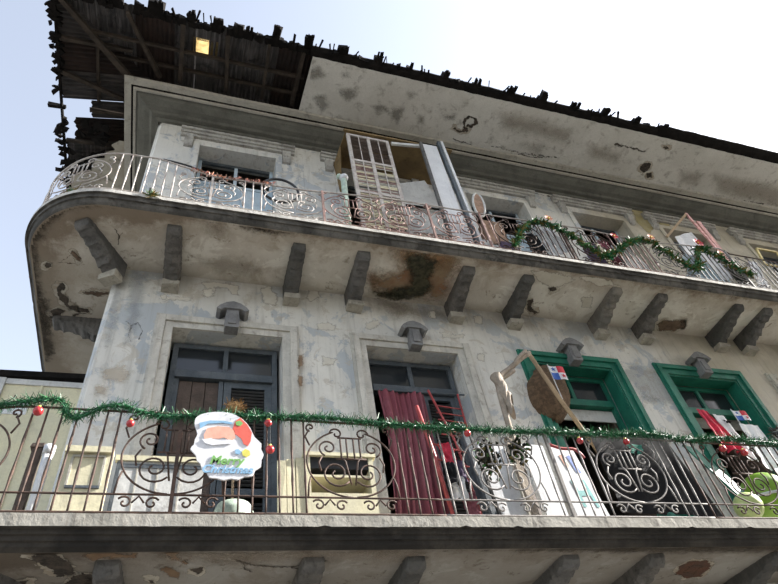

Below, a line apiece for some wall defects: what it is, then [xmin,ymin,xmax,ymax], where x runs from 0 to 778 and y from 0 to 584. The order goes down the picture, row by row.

spalling [637,161,654,180]
spalling [40,248,84,271]
water stain [374,251,437,301]
spalling [46,281,110,317]
spalling [655,318,688,333]
spalling [16,554,93,584]
spalling [673,558,715,580]